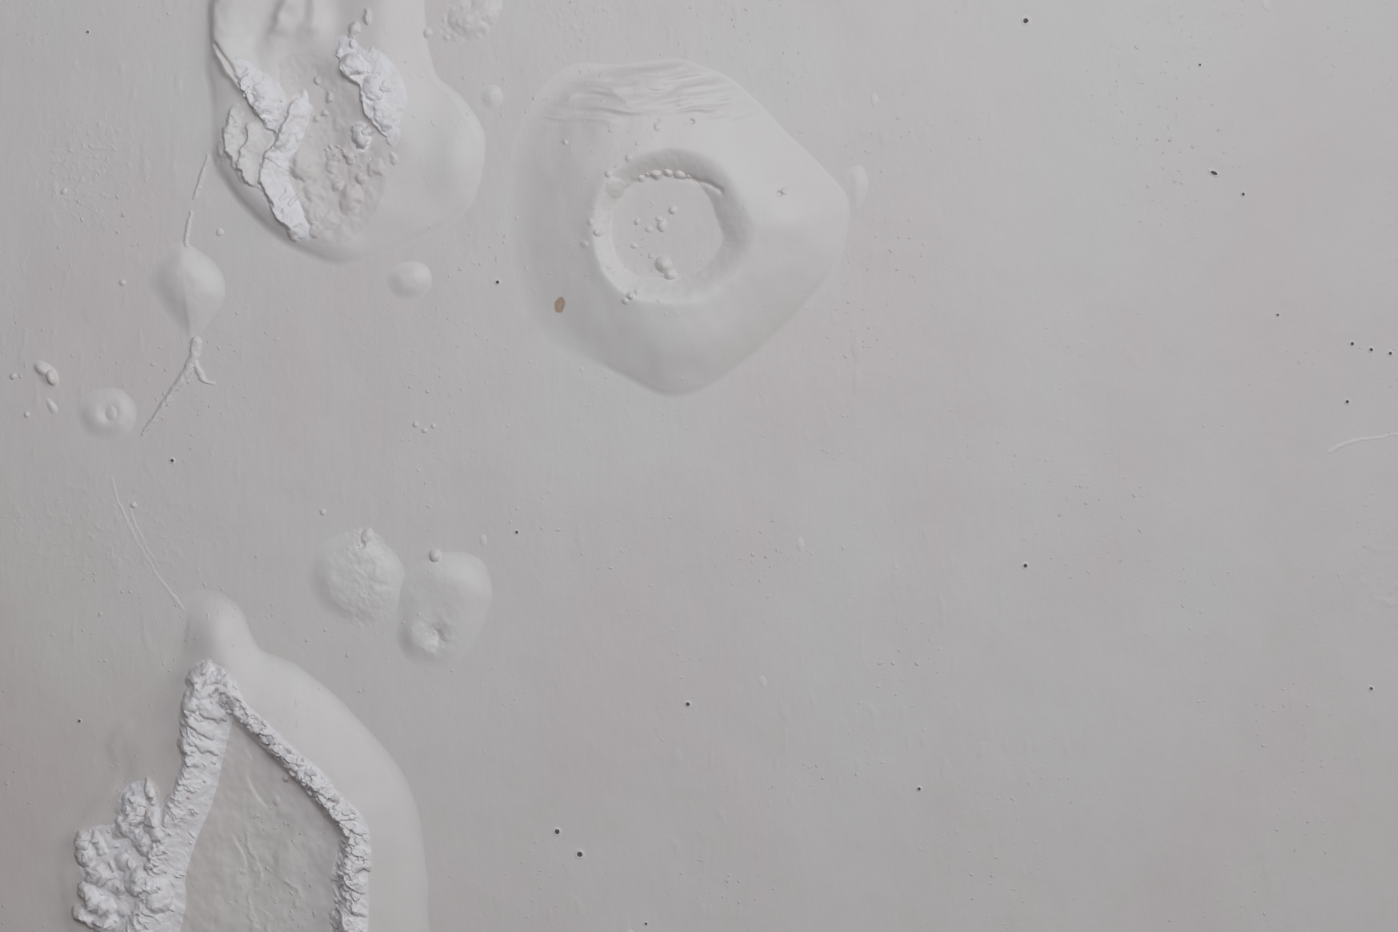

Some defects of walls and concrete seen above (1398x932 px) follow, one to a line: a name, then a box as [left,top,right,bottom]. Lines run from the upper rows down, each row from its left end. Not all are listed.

crack [183,154,210,247]
crack [141,336,216,436]